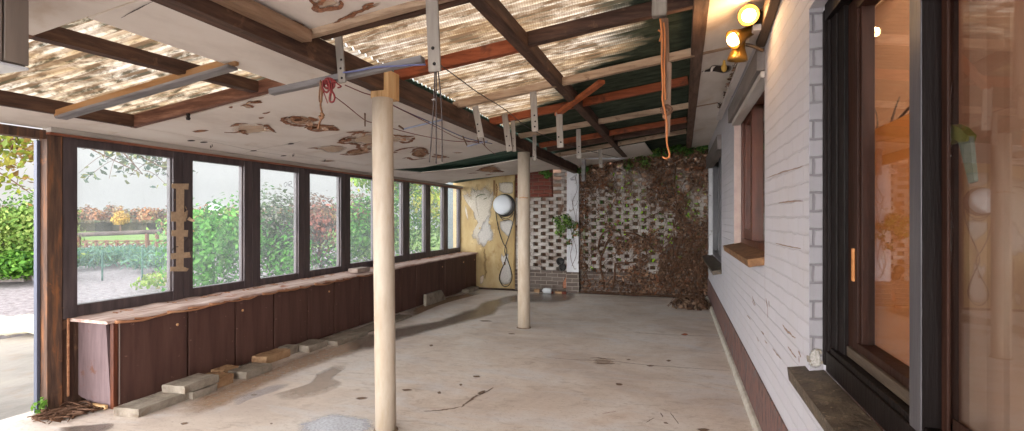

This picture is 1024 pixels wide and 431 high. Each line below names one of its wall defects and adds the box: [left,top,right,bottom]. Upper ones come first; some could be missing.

peeling [464,183,513,251]
water stain [395,292,571,340]
water stain [356,334,374,349]
water stain [292,369,340,394]
crack [432,388,492,411]